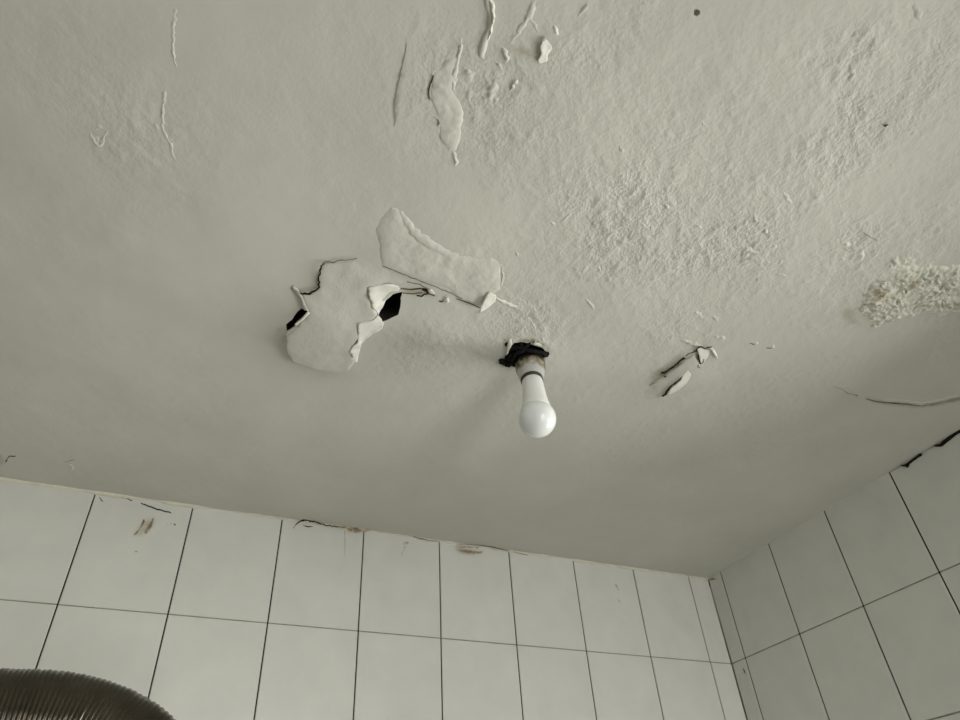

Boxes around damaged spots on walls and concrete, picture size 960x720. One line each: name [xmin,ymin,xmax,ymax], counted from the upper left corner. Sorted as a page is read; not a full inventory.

flaking render [537,17,559,64]
crack [394,44,407,125]
flaking render [428,38,464,166]
flaking render [285,258,403,373]
flaking render [643,335,726,399]
crack [834,385,960,406]